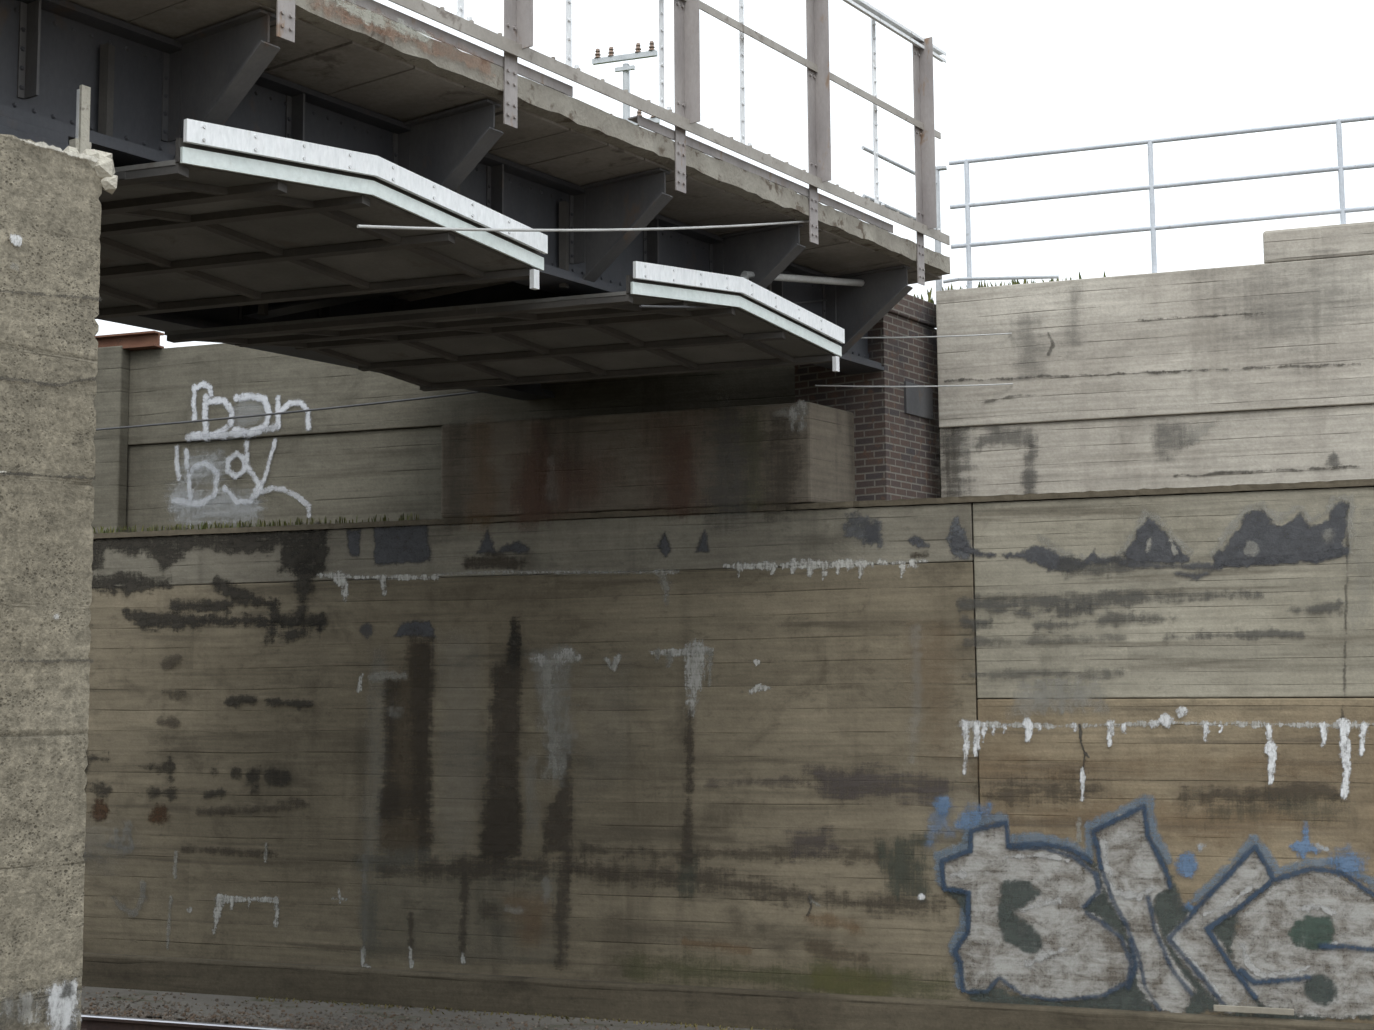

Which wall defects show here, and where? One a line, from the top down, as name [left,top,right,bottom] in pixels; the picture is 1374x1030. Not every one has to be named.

leakage [91,521,439,644]
leakage [723,558,926,580]
crack [3,657,93,665]
leakage [357,620,945,967]
leakage [803,707,1374,806]
leakage [5,981,78,1030]